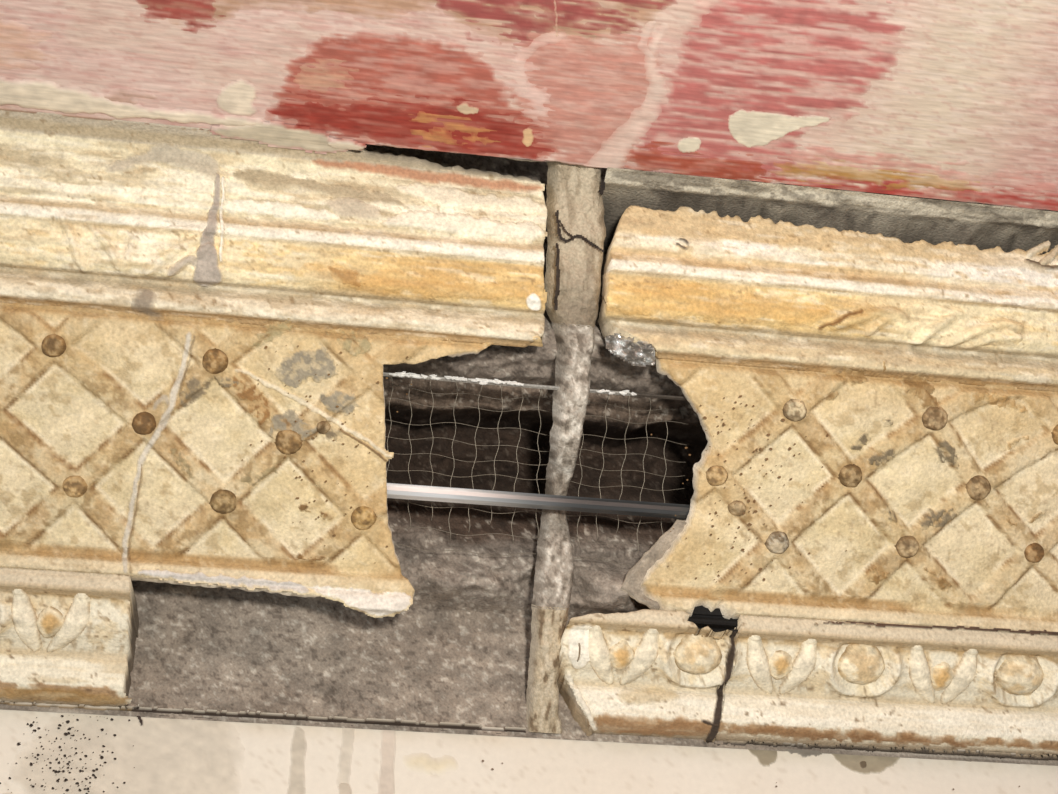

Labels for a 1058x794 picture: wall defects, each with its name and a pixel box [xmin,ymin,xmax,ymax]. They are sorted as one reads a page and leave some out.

crack [166,173,226,287]
peeling [179,328,374,442]
peeling [389,371,524,386]
crack [120,331,196,575]
peeling [137,569,413,618]
crack [814,621,1058,636]
peeling [564,623,598,731]
crack [701,629,1058,764]
leakage [0,713,245,794]
leakage [286,727,307,794]
leakage [336,728,355,794]
leakage [377,730,459,794]